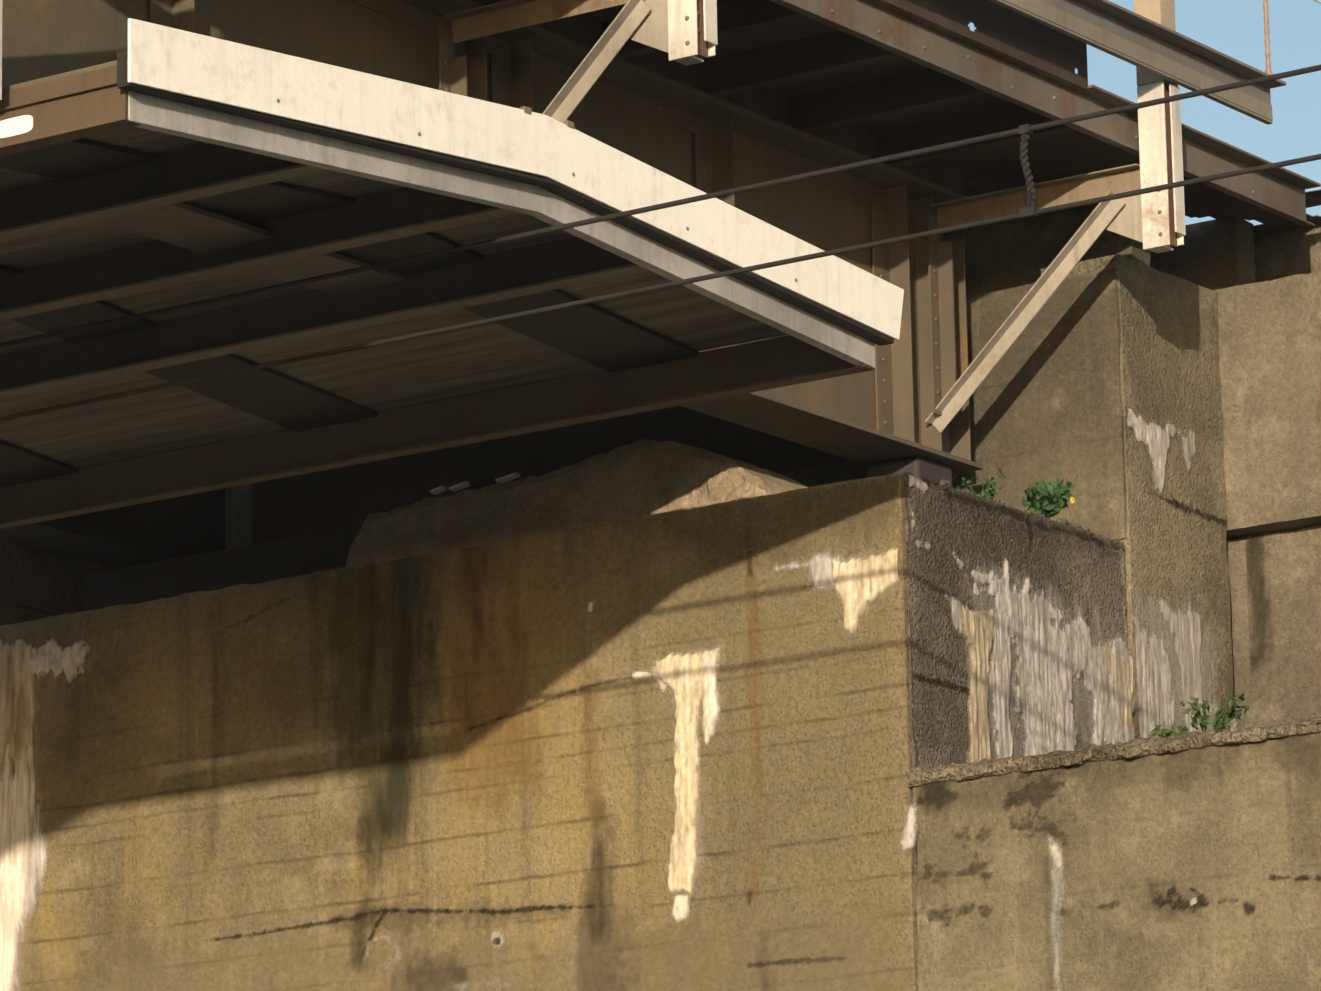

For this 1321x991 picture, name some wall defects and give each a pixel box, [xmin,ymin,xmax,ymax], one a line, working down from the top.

efflorescence [1127,409,1196,493]
damp [0,638,89,991]
damp [317,558,433,837]
efflorescence [633,649,718,921]
efflorescence [776,549,899,632]
efflorescence [945,556,1237,763]